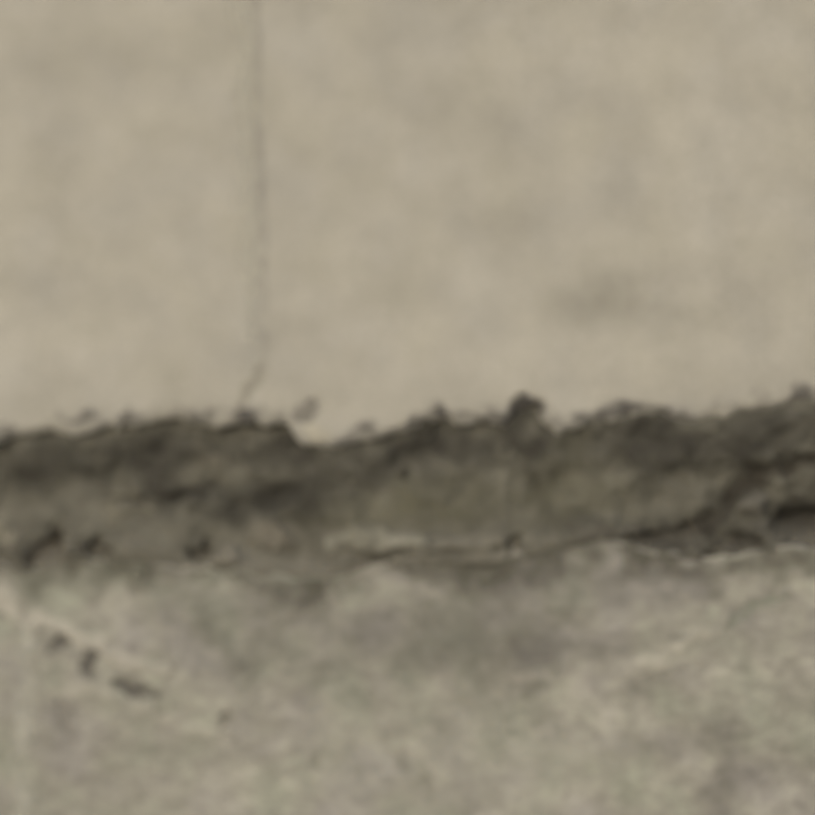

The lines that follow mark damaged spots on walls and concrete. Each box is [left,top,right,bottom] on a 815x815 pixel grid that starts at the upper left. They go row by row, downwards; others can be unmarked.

spalling [290,397,331,446]
spalling [412,393,548,425]